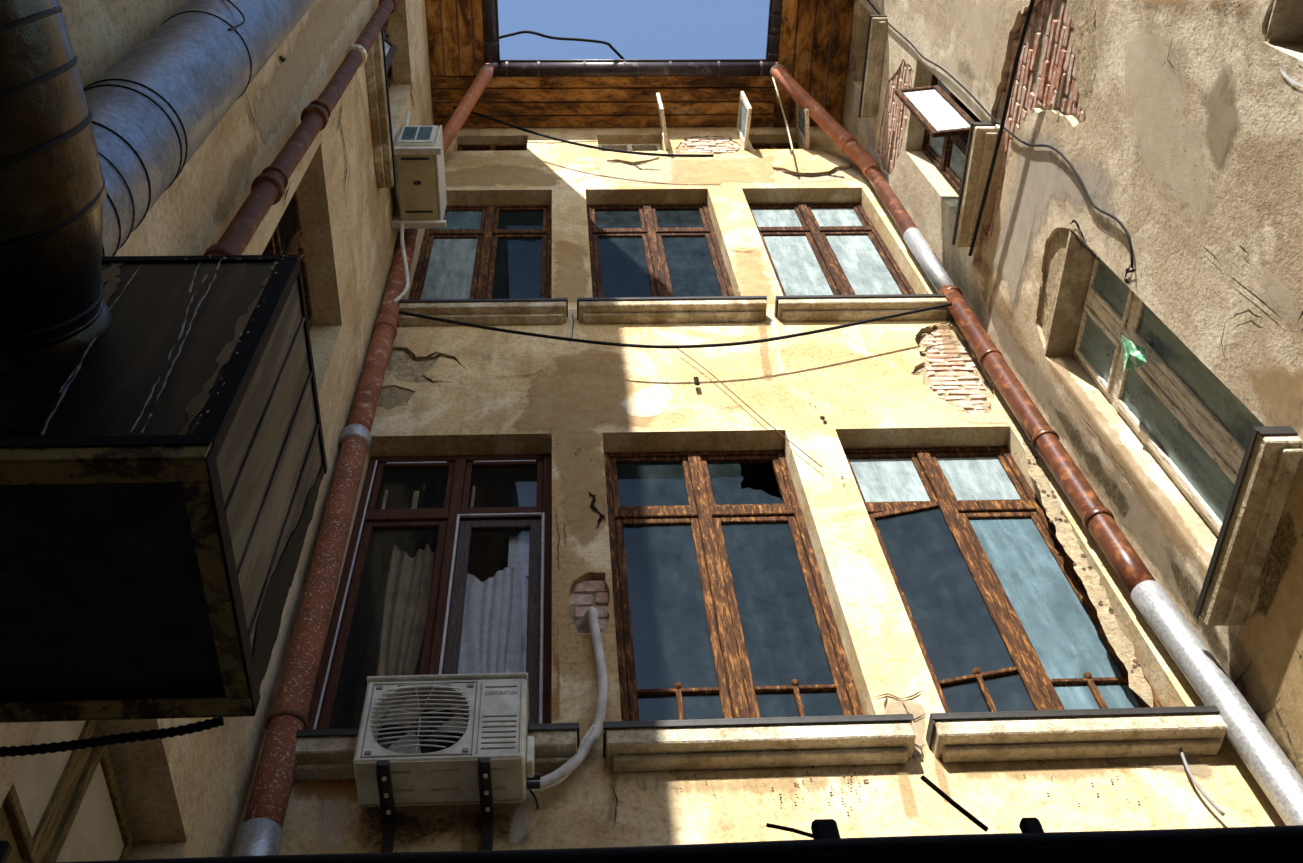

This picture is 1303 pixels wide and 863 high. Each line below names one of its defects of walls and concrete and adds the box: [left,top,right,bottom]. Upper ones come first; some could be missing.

spalling [878,60,913,175]
spalling [980,0,1099,262]
spalling [377,345,455,410]
leakage [516,241,672,544]
crack [556,491,606,569]
spalling [914,323,1153,707]
spalling [569,579,609,635]